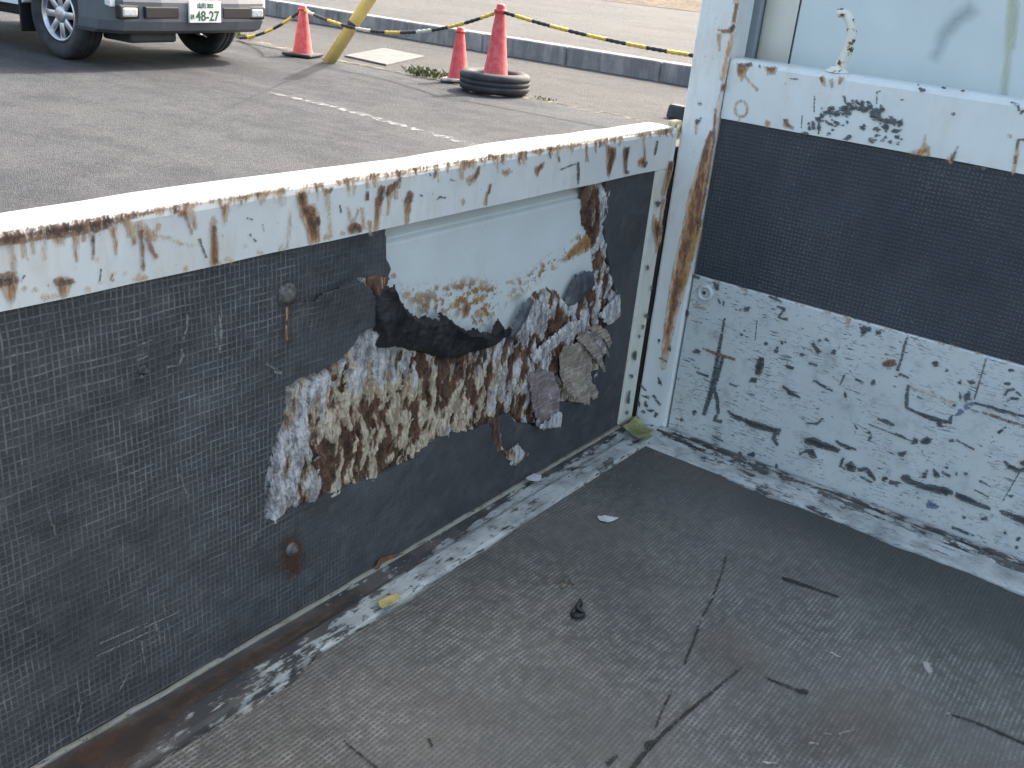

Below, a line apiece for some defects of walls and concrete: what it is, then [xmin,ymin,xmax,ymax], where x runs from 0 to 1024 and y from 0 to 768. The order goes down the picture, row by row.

peeling [802,96,903,145]
corrosion [0,127,674,301]
corrosion [661,0,776,370]
corrosion [403,235,592,322]
peeling [264,182,621,524]
peeling [727,411,781,446]
peeling [739,307,783,383]
peeling [895,433,933,457]
peeling [952,379,979,416]
peeling [1003,369,1021,402]
peeling [799,437,1024,536]